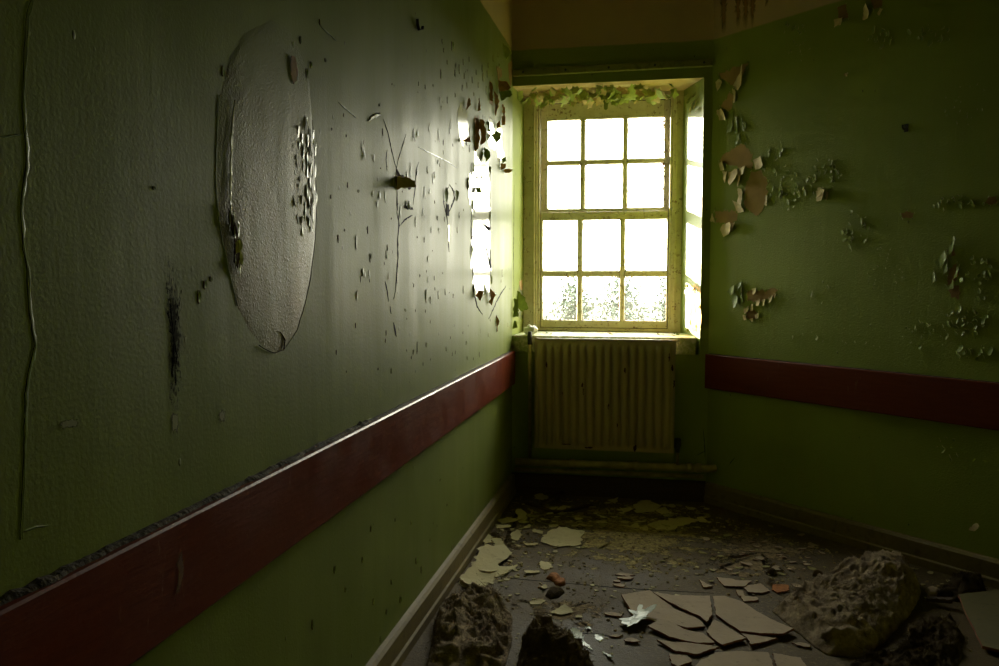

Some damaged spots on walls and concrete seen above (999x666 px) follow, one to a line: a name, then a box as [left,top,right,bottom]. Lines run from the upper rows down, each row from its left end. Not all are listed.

crack [0,0,49,539]
leakage [167,265,181,405]
peeling [405,39,701,337]
peeling [710,61,769,237]
peeling [727,282,779,323]
peeling [930,236,963,299]